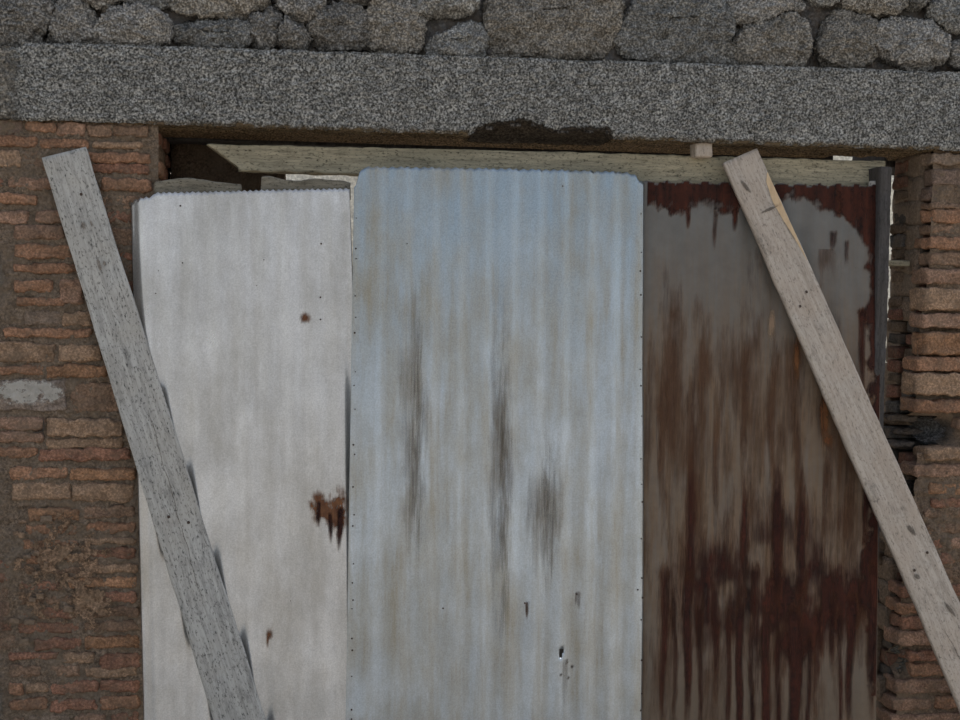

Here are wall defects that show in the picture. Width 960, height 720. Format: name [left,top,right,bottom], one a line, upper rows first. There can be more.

corrosion [647,180,740,238]
corrosion [774,183,880,420]
corrosion [310,491,346,545]
corrosion [645,307,878,720]